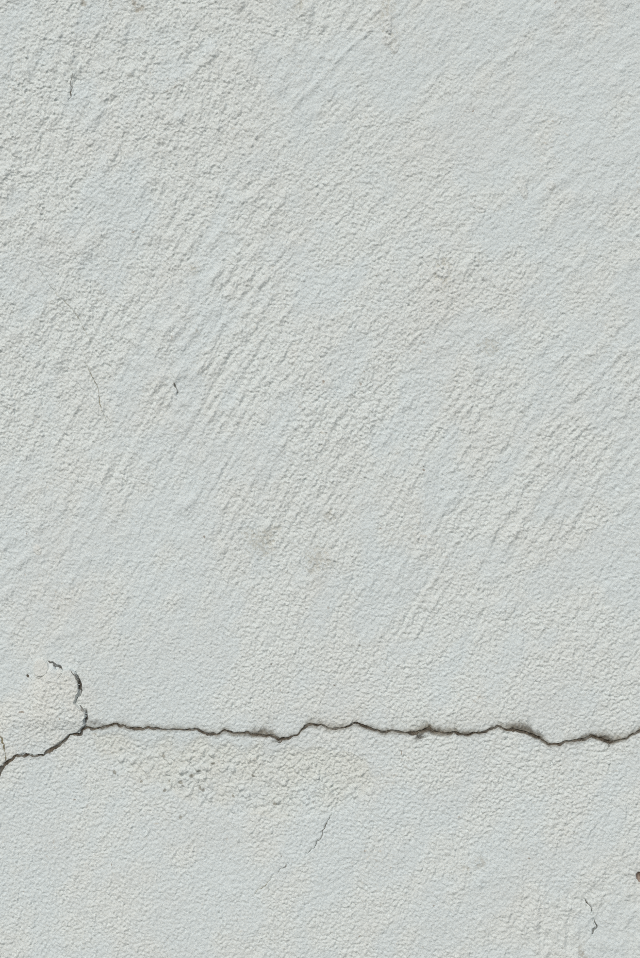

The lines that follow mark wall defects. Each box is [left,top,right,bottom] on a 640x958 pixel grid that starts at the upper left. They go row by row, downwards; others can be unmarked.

crack [0,722,627,776]